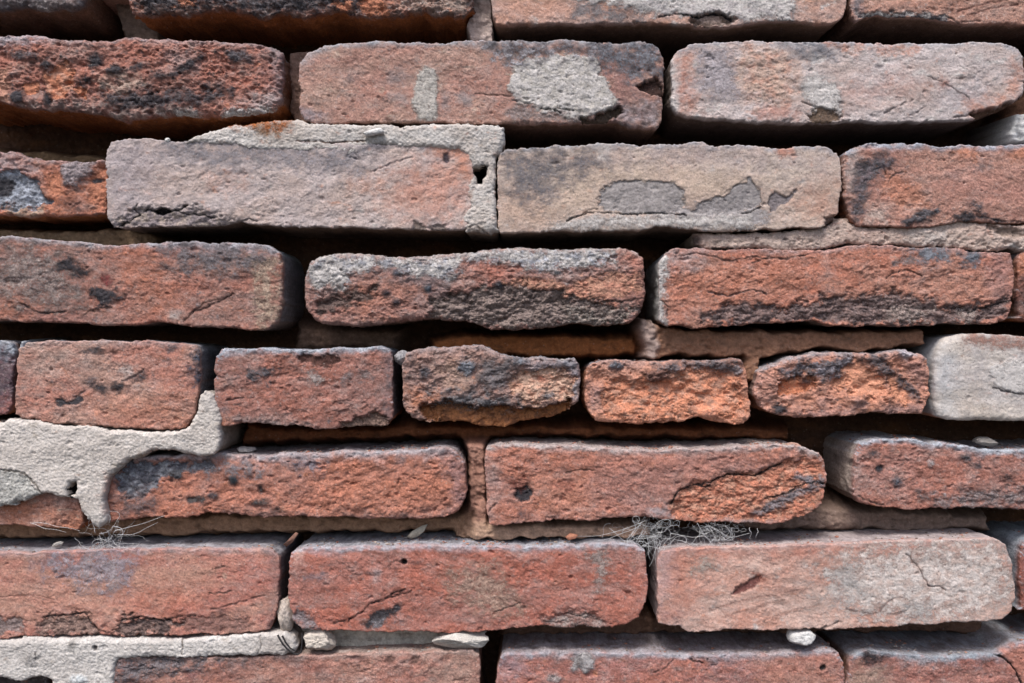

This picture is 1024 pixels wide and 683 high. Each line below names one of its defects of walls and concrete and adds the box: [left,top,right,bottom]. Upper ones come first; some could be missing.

crack [119,204,215,227]
peeling [598,177,796,232]
crack [333,589,412,624]